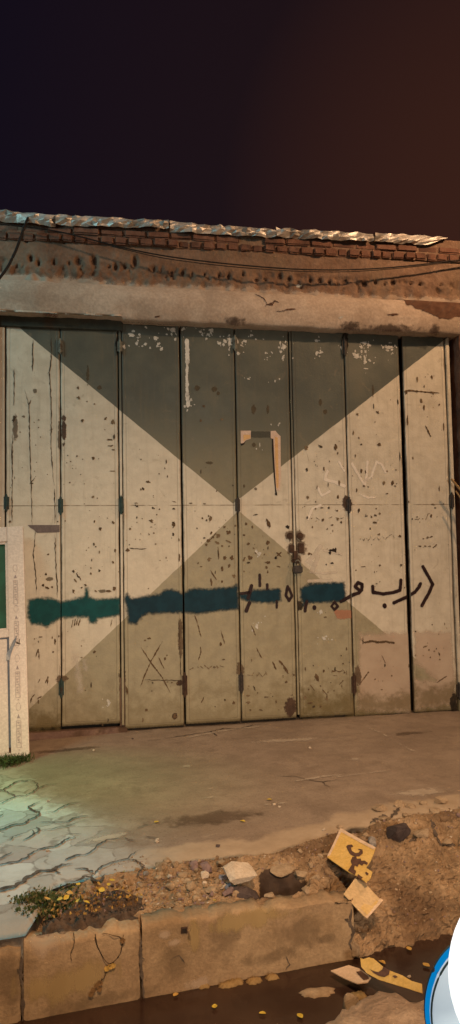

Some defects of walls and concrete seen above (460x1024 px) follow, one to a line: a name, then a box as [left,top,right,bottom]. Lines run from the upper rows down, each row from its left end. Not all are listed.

flaking render [388,284,460,319]
crack [0,779,158,891]